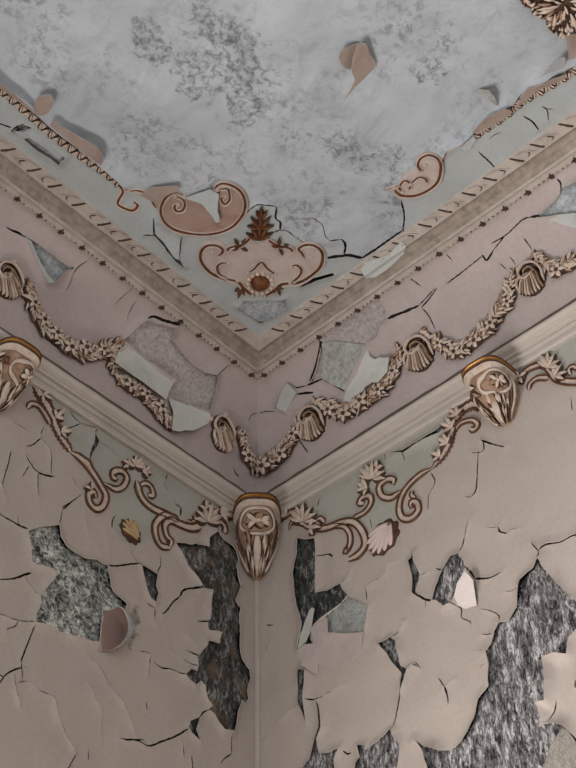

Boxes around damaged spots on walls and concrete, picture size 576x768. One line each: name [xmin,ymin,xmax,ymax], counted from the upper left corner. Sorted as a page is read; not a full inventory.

crack [303,200,405,285]
crack [388,214,540,330]
peeling [115,312,224,432]
crack [296,341,345,395]
peeling [271,293,395,418]
crack [379,414,450,463]
peeling [17,516,134,655]
peeling [171,526,255,749]
peeling [288,532,374,675]
crack [403,545,443,606]
peeling [297,545,576,768]
crack [124,730,193,768]